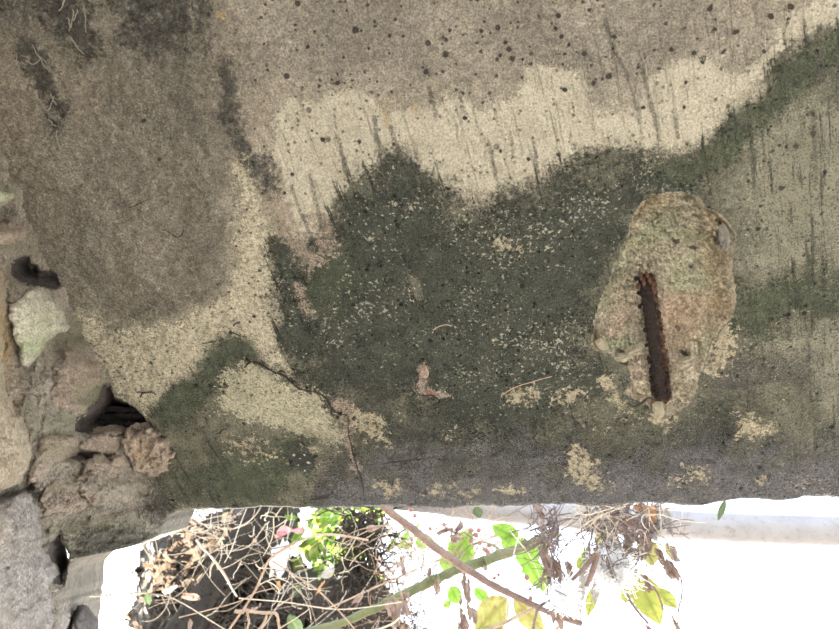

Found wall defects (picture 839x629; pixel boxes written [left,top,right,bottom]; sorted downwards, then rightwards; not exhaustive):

leakage [266,0,839,279]
spalling [70,452,93,466]
spalling [74,384,155,438]
leakage [73,149,298,422]
crack [203,321,247,344]
crack [242,359,451,503]
peeling [493,234,524,259]
spalling [500,192,744,439]
corrosion [648,273,672,404]
leakage [763,313,839,434]